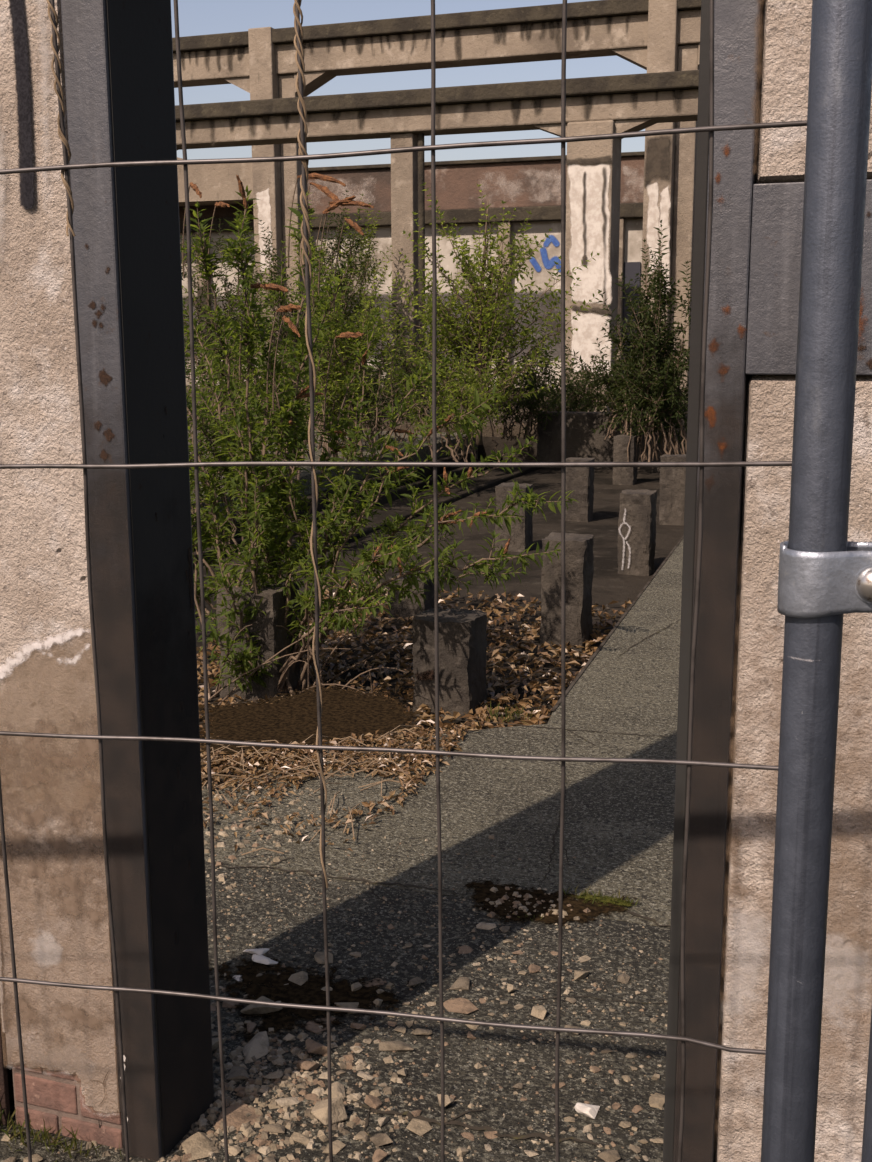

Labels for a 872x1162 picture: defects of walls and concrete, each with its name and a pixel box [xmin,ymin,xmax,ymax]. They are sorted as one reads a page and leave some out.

corrosion [88,301,105,328]
corrosion [99,368,112,386]
leakage [0,629,108,928]
leakage [2,994,112,1046]
spalling [12,1064,128,1149]